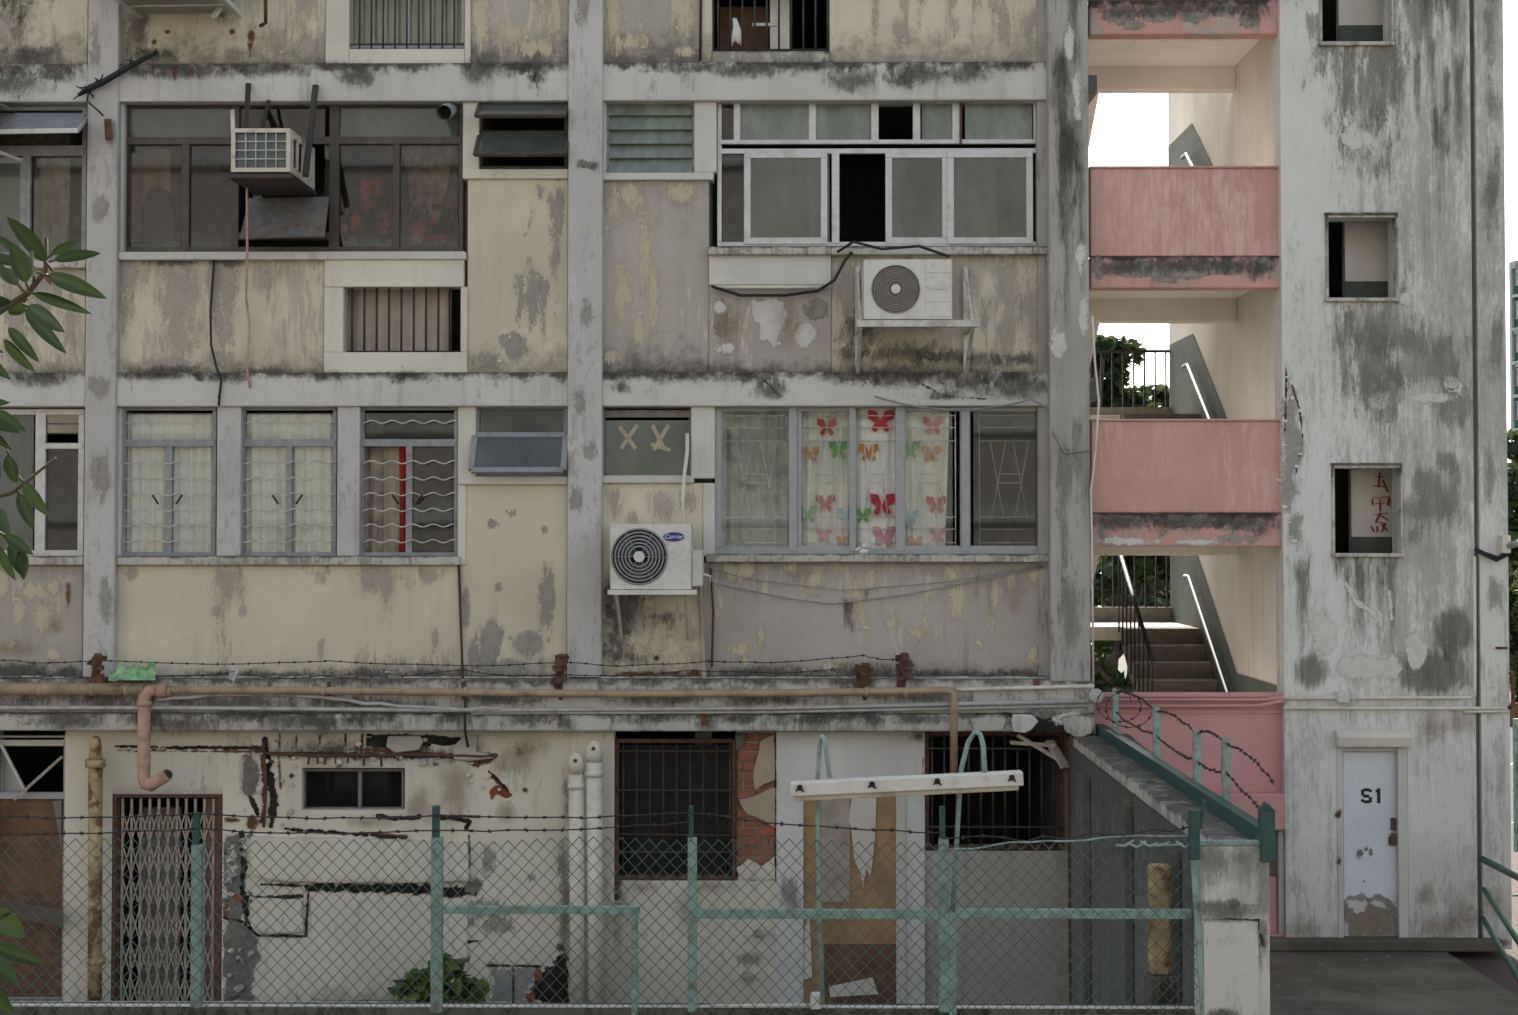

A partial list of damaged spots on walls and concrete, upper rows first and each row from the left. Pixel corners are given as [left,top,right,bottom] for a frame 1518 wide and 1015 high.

damp [670,59,1033,92]
damp [1303,0,1462,177]
peeling [472,185,565,369]
peeling [711,298,736,354]
peeling [750,267,855,349]
damp [1103,257,1271,277]
damp [1336,288,1471,428]
damp [1490,319,1503,372]
damp [1093,514,1275,535]
peeling [0,566,61,662]
rust [470,752,496,767]
spalling [735,731,776,881]